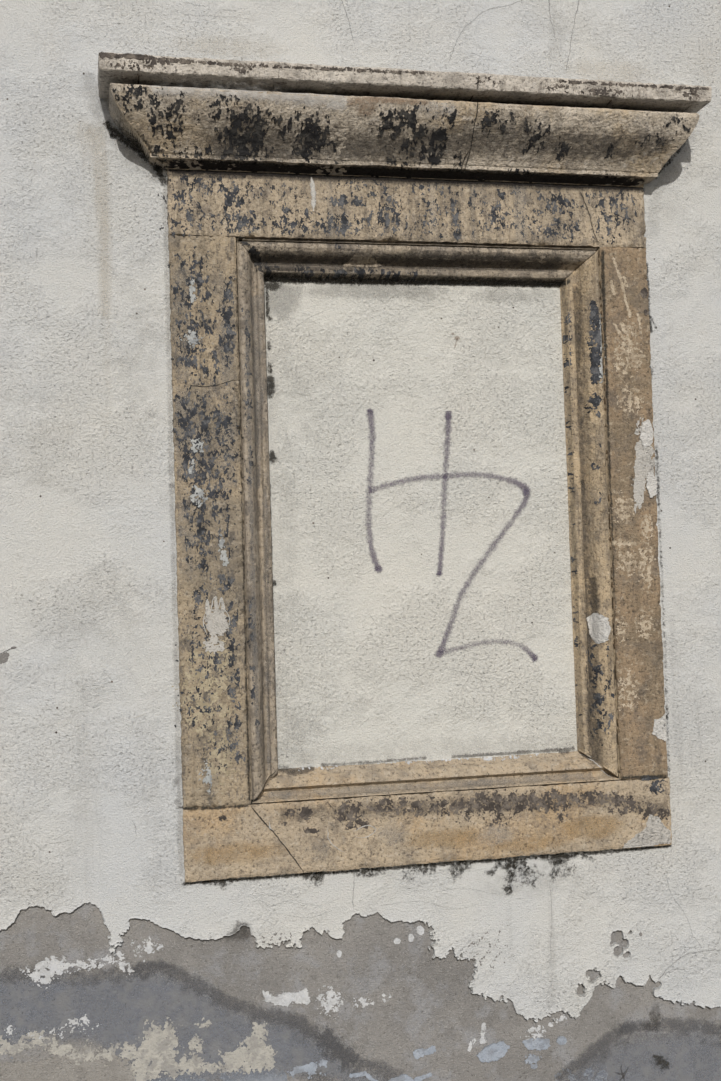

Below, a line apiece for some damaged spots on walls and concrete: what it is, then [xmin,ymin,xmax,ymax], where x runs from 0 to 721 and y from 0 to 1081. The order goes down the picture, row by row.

leakage [105,121,168,185]
peeling [108,60,643,794]
leakage [182,845,672,894]
peeling [394,926,424,944]
peeling [20,936,163,989]
leakage [135,962,397,1079]
peeling [287,1059,328,1079]
peeling [262,985,392,1020]
peeling [349,1071,432,1081]
peeling [468,1023,510,1063]
peeling [520,1014,567,1069]
leakage [557,1012,721,1079]